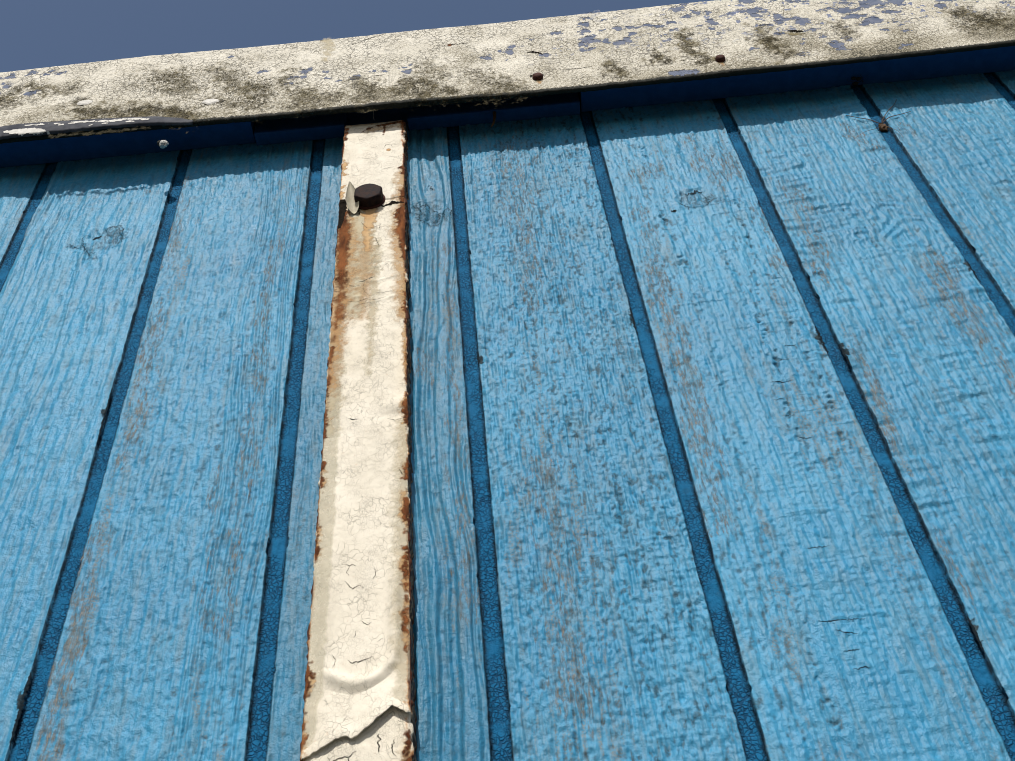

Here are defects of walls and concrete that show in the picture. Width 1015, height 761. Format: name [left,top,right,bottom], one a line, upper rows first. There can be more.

damp [644,28,717,67]
damp [745,20,803,64]
damp [943,6,1013,33]
damp [0,68,201,120]
damp [383,65,519,107]
corrosion [392,166,408,424]
corrosion [323,208,378,438]
corrosion [398,460,409,533]
corrosion [399,546,410,652]
corrosion [300,662,316,761]
crack [328,734,396,761]
corrosion [402,729,412,761]